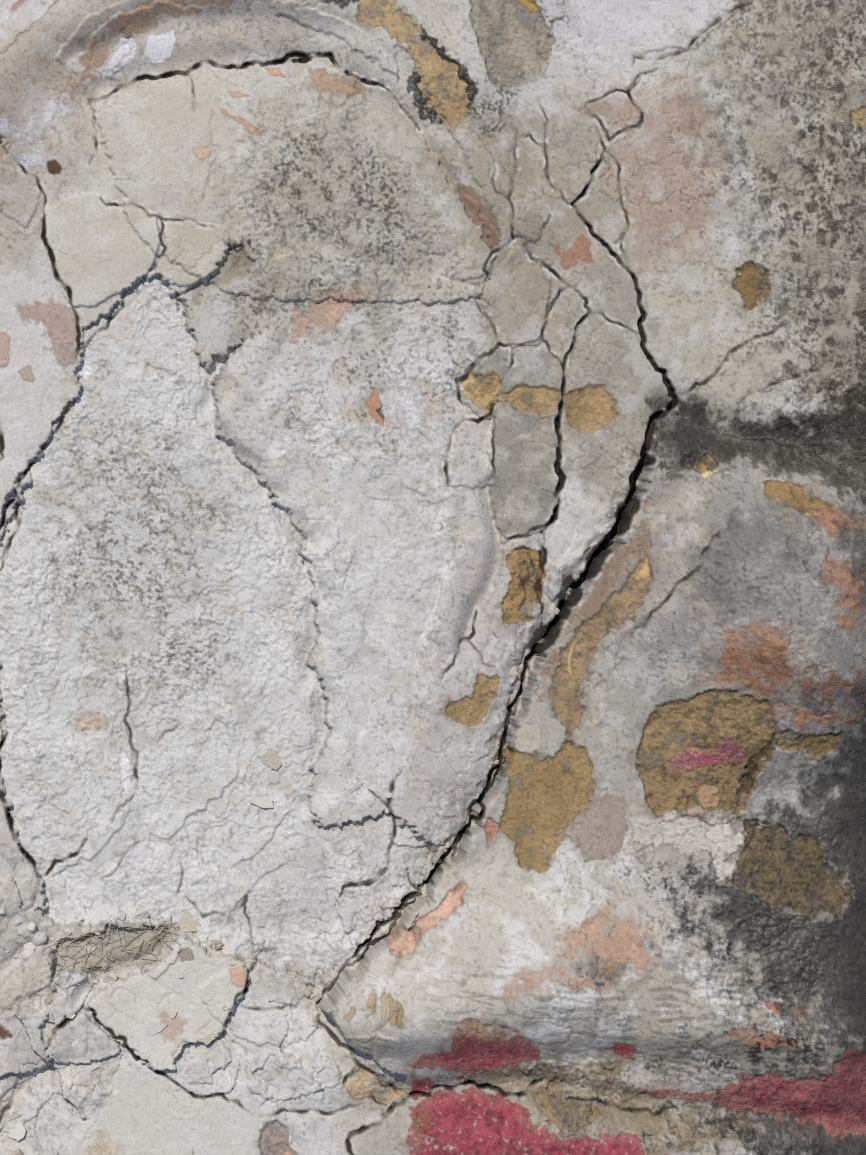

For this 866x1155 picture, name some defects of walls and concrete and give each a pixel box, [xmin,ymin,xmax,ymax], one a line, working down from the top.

crack [107,52,388,97]
spalling [355,0,473,135]
spalling [469,0,555,91]
crack [18,163,119,352]
spalling [461,370,621,434]
water stain [645,0,866,617]
spalling [0,274,468,987]
crack [229,2,774,1155]
crack [0,733,86,875]
spalling [481,545,866,921]
water stain [624,681,866,1155]
crack [54,1008,242,1106]